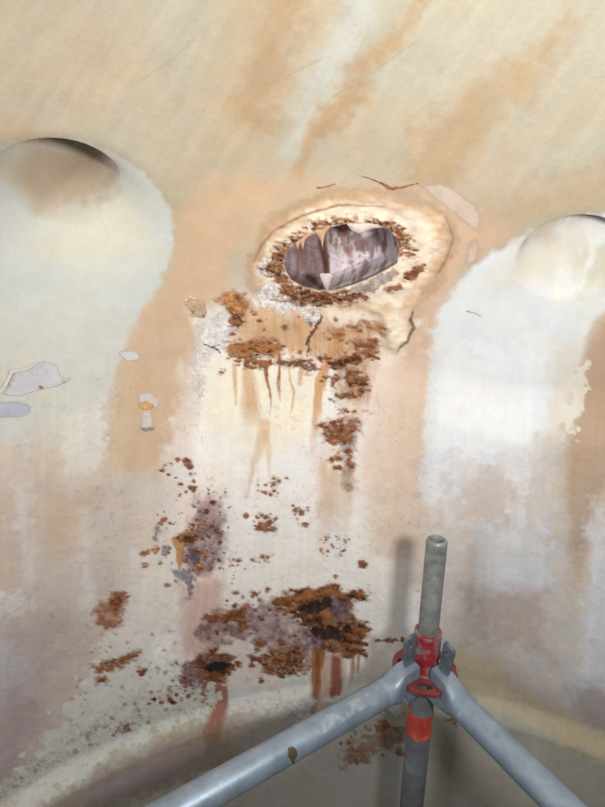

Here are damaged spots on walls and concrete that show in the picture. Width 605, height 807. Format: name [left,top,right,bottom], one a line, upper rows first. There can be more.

crack [365,177,419,190]
peeling [347,223,384,234]
peeling [320,273,333,291]
rust [215,291,248,327]
peeling [0,362,70,417]
peeling [119,350,141,361]
peeling [139,393,159,432]
rust [227,338,295,405]
rust [316,320,386,491]
rust [243,513,278,532]
rust [195,575,404,707]
efflorescence [230,695,341,713]